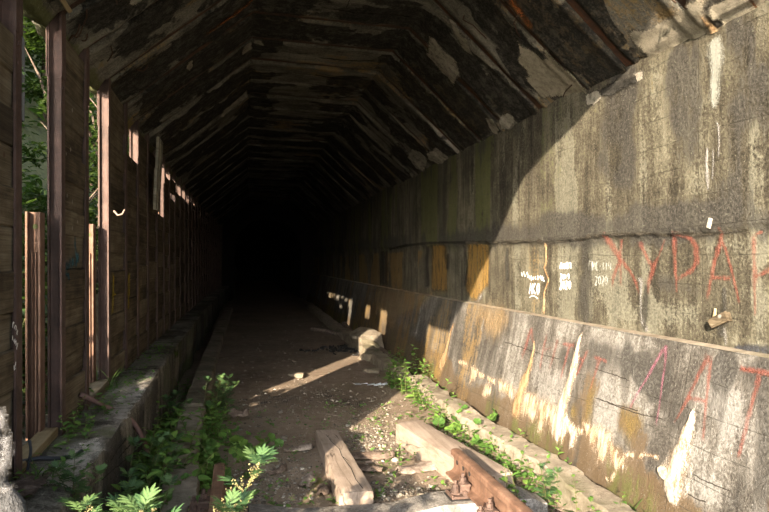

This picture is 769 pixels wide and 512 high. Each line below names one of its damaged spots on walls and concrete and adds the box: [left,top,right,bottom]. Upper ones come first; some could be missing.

spalling [628,0,766,57]
spalling [426,36,459,86]
leakage [710,38,722,107]
spalling [485,113,516,134]
spalling [407,147,449,171]
leakage [705,122,720,188]